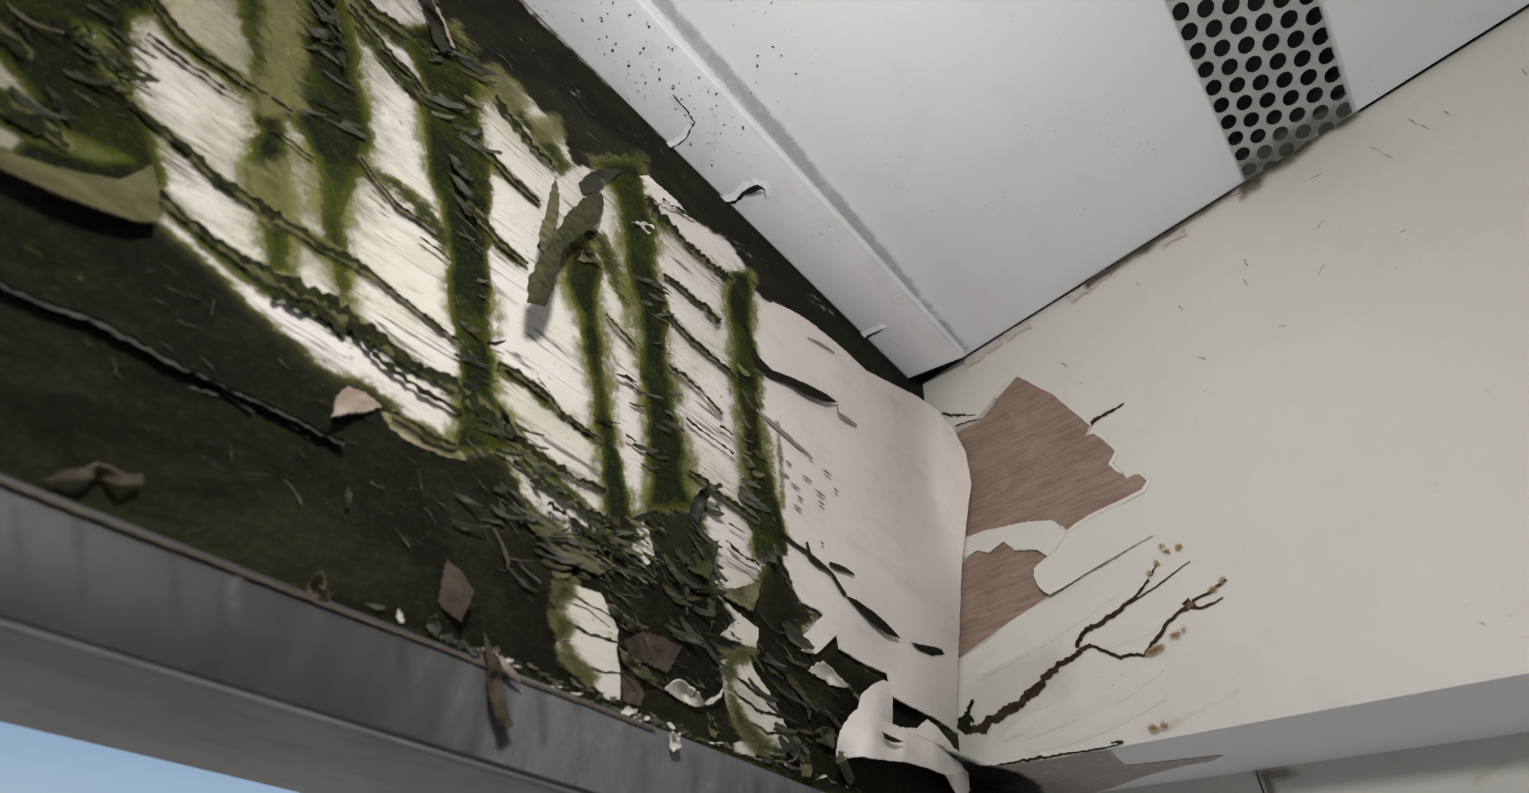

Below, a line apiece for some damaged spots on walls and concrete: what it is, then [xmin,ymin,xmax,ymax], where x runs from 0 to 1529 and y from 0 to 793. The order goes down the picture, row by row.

peeling [0,148,160,224]
peeling [331,386,381,418]
crack [130,94,637,559]
damp [0,170,1043,793]
peeling [450,403,657,578]
peeling [527,167,621,307]
peeling [640,175,686,213]
damp [434,0,925,401]
crack [667,94,695,148]
crack [605,177,857,597]
peeling [607,302,1151,793]
crack [957,535,1227,766]